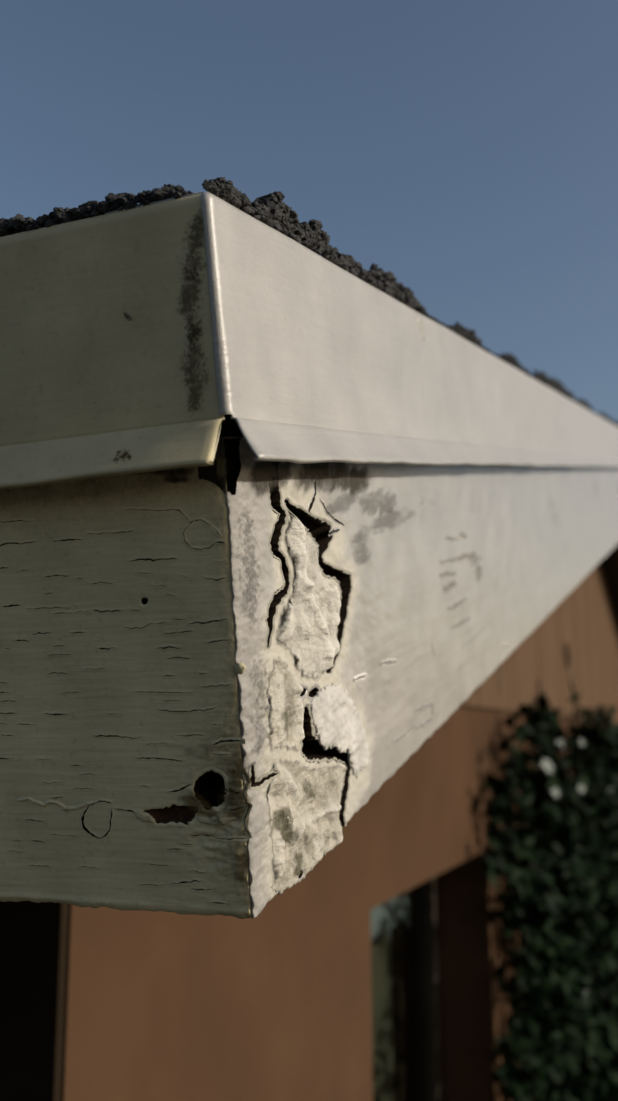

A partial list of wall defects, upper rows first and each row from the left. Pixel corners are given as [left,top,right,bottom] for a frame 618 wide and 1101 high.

water stain [179,213,208,411]
crack [265,461,353,672]
crack [0,517,280,906]
spalling [142,800,237,829]
peeling [233,662,246,675]
crack [301,706,352,828]
peeling [299,673,370,779]